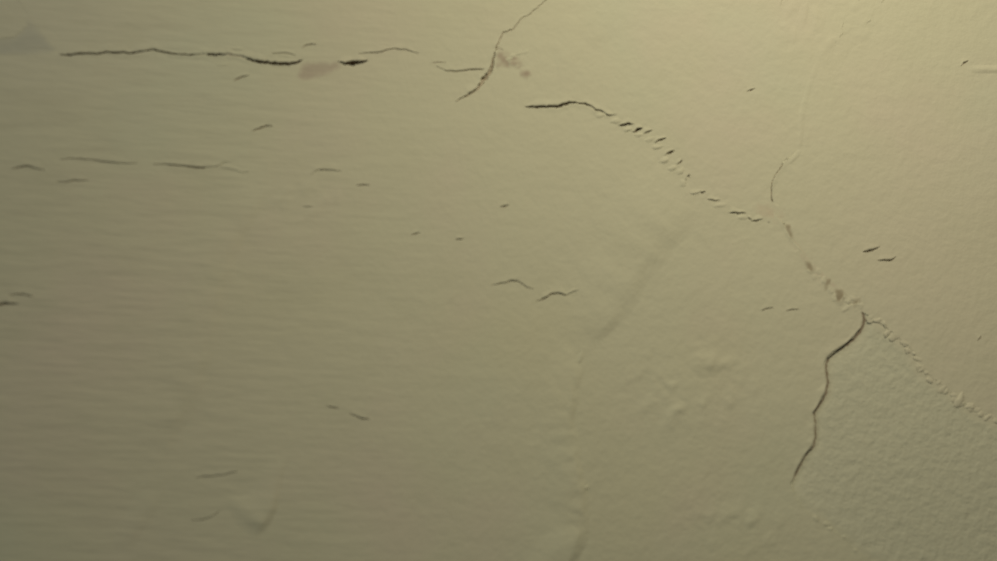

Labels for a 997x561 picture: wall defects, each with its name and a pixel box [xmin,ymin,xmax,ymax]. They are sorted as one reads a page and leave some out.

crack [59,42,304,68]
crack [335,0,552,102]
crack [60,154,249,173]
crack [491,274,578,302]
crack [524,97,866,482]